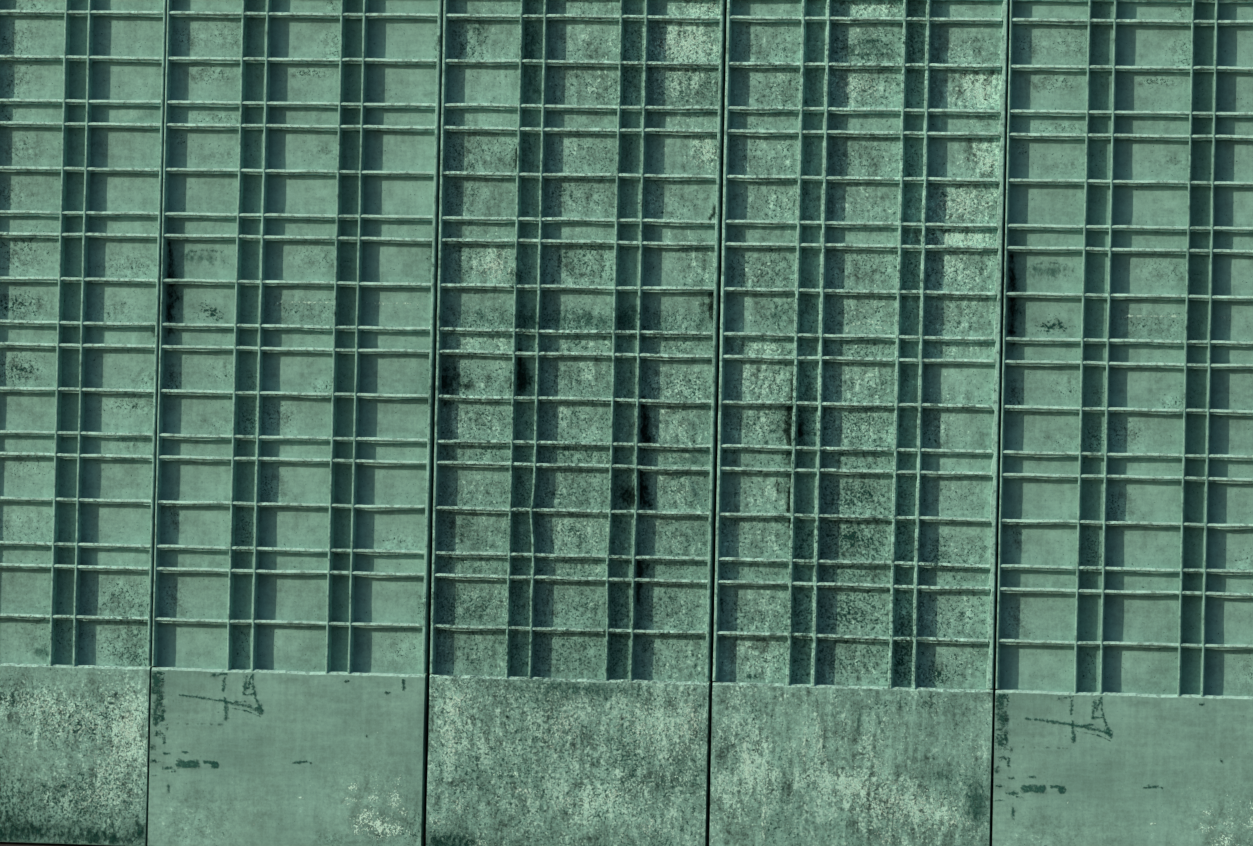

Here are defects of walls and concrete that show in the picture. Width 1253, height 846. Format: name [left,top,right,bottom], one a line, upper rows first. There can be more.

peeling [0,671,219,814]
peeling [994,694,1069,816]
leakage [0,802,144,845]